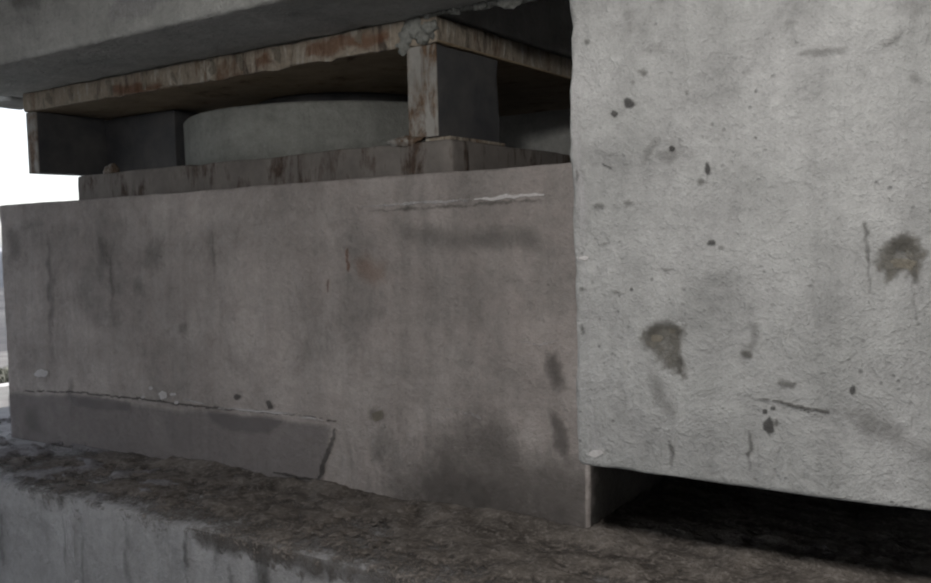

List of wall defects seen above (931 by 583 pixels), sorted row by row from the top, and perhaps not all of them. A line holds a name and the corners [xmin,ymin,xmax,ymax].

damp [399,434,668,527]